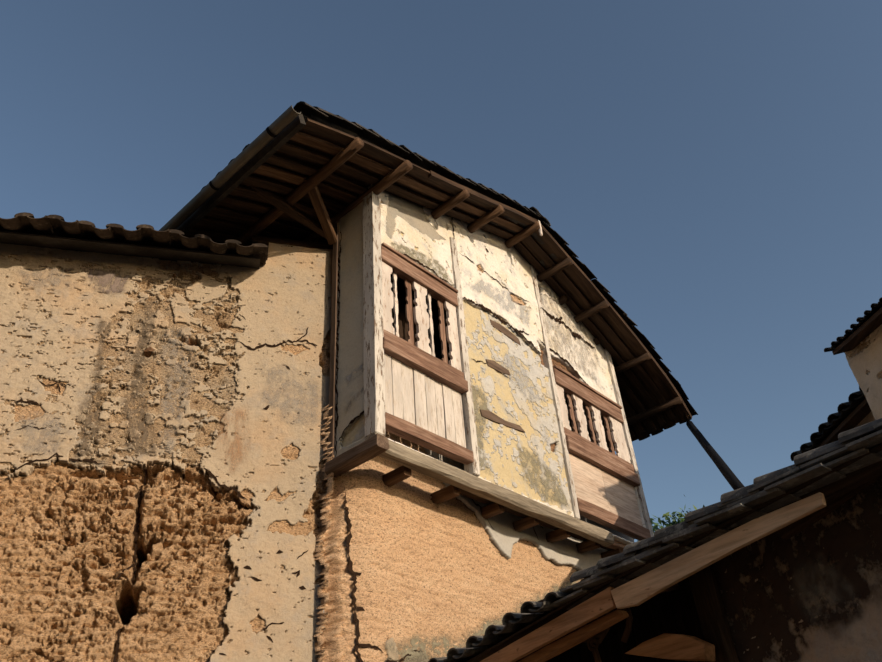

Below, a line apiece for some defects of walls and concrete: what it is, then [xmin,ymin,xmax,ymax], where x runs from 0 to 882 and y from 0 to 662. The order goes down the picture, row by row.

peeling [380,194,462,258]
spalling [0,250,328,662]
crack [238,328,328,350]
spalling [318,331,331,378]
peeling [463,300,577,515]
crack [116,471,146,582]
crack [344,487,424,662]